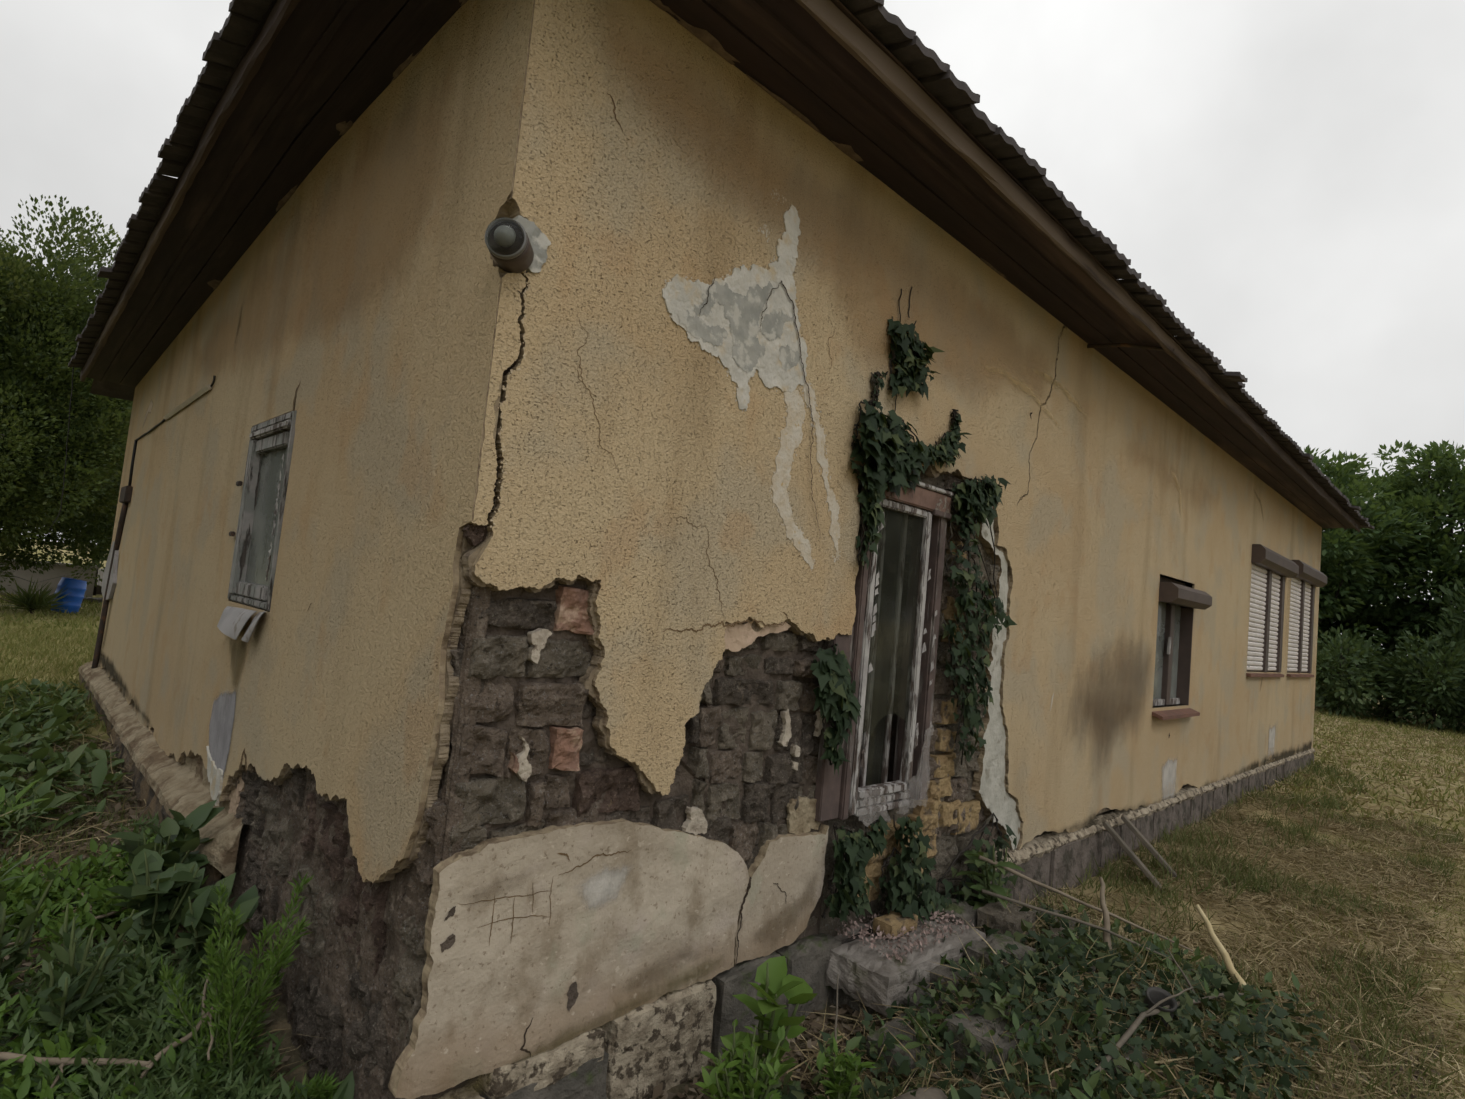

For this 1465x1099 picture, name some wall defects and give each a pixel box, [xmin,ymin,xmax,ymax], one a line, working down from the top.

peeling [677,280,800,373]
crack [482,272,531,542]
crack [663,516,788,633]
flaking render [185,467,1021,1099]
crack [735,877,787,966]